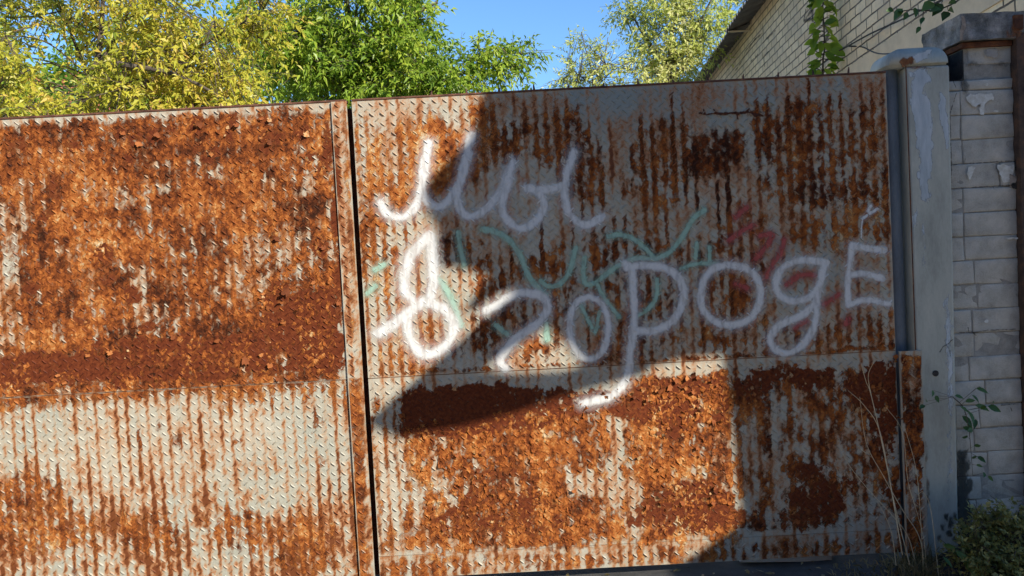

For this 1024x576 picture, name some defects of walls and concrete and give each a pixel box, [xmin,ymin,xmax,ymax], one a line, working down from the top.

rust [0,78,925,576]
peeling [909,50,949,234]